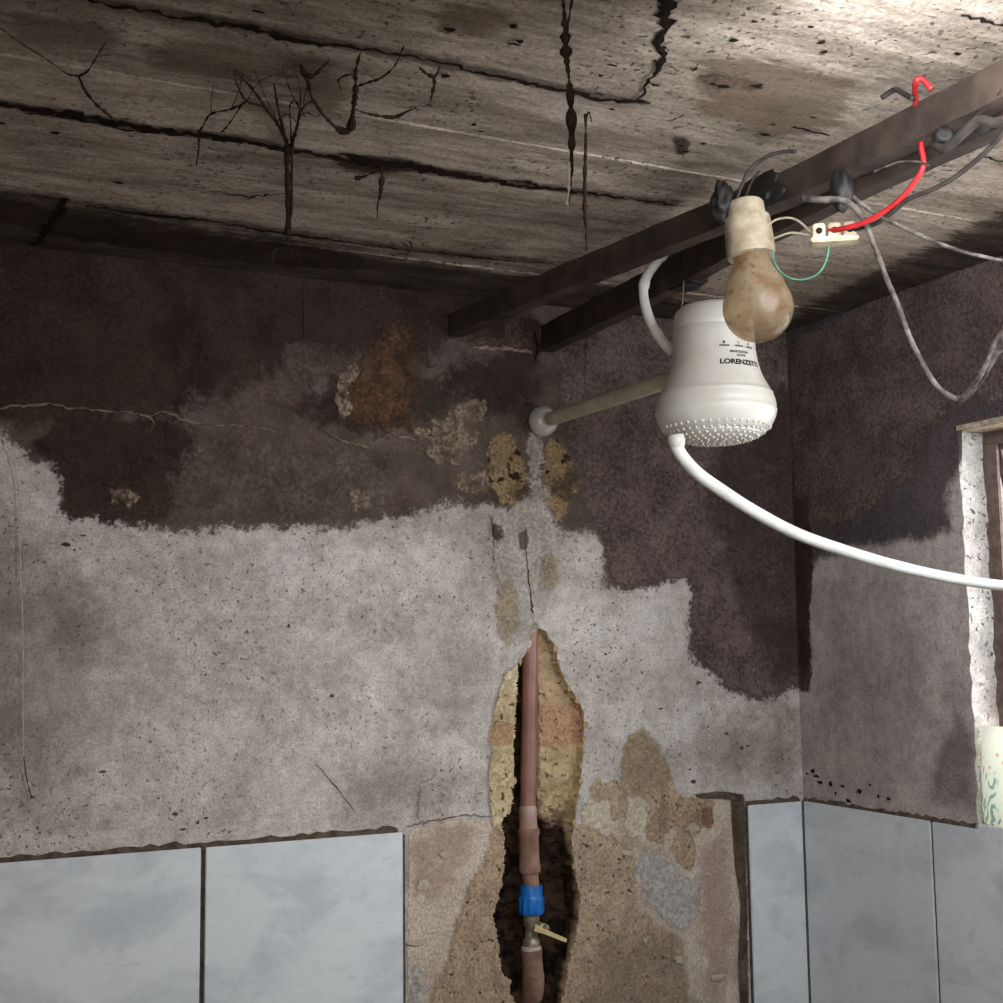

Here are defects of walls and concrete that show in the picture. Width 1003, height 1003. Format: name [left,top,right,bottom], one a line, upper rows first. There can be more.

crack [0,98,680,206]
crack [68,0,678,105]
damp [697,59,855,137]
crack [792,126,830,136]
crack [30,198,552,264]
crack [0,403,287,435]
rust [335,321,421,438]
flaking render [412,399,529,507]
spalling [473,345,532,354]
flaking render [542,438,583,526]
damp [706,383,814,692]
peeling [407,609,749,1003]